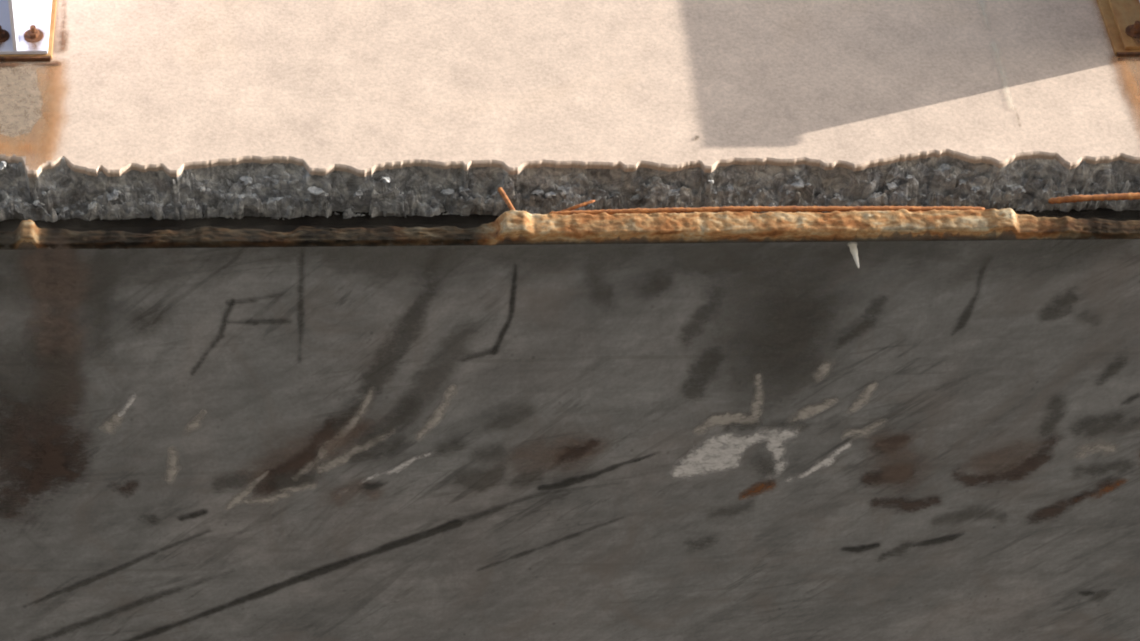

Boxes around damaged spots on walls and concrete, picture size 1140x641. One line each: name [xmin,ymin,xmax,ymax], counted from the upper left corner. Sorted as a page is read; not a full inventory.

corrosion [0,17,68,167]
spalling [0,156,1140,222]
crack [462,269,517,361]
leakage [0,243,84,518]
leakage [101,395,136,433]
leakage [673,374,885,481]